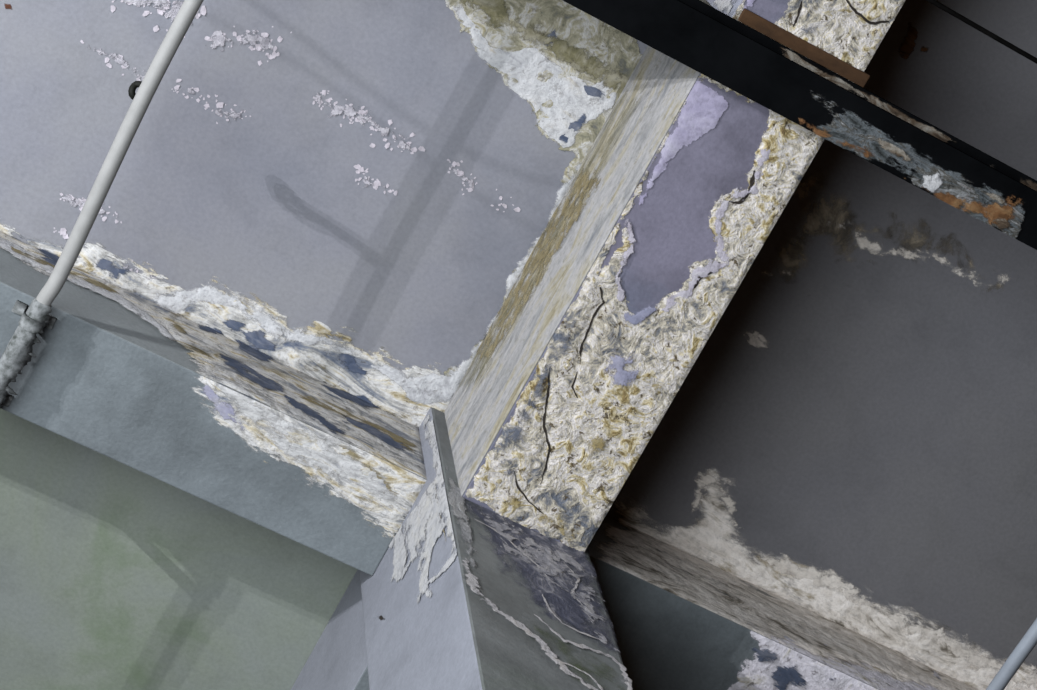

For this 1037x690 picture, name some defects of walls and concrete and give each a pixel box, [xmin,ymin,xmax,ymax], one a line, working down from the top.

damp [714,0,736,14]
spalling [774,0,905,72]
peeling [312,90,425,154]
peeling [353,164,398,196]
corrosion [798,95,1025,239]
damp [0,224,63,276]
damp [778,174,976,284]
damp [67,0,700,653]
spalling [466,74,825,552]
damp [597,469,1007,690]
peeling [728,622,942,690]
damp [1004,663,1037,690]